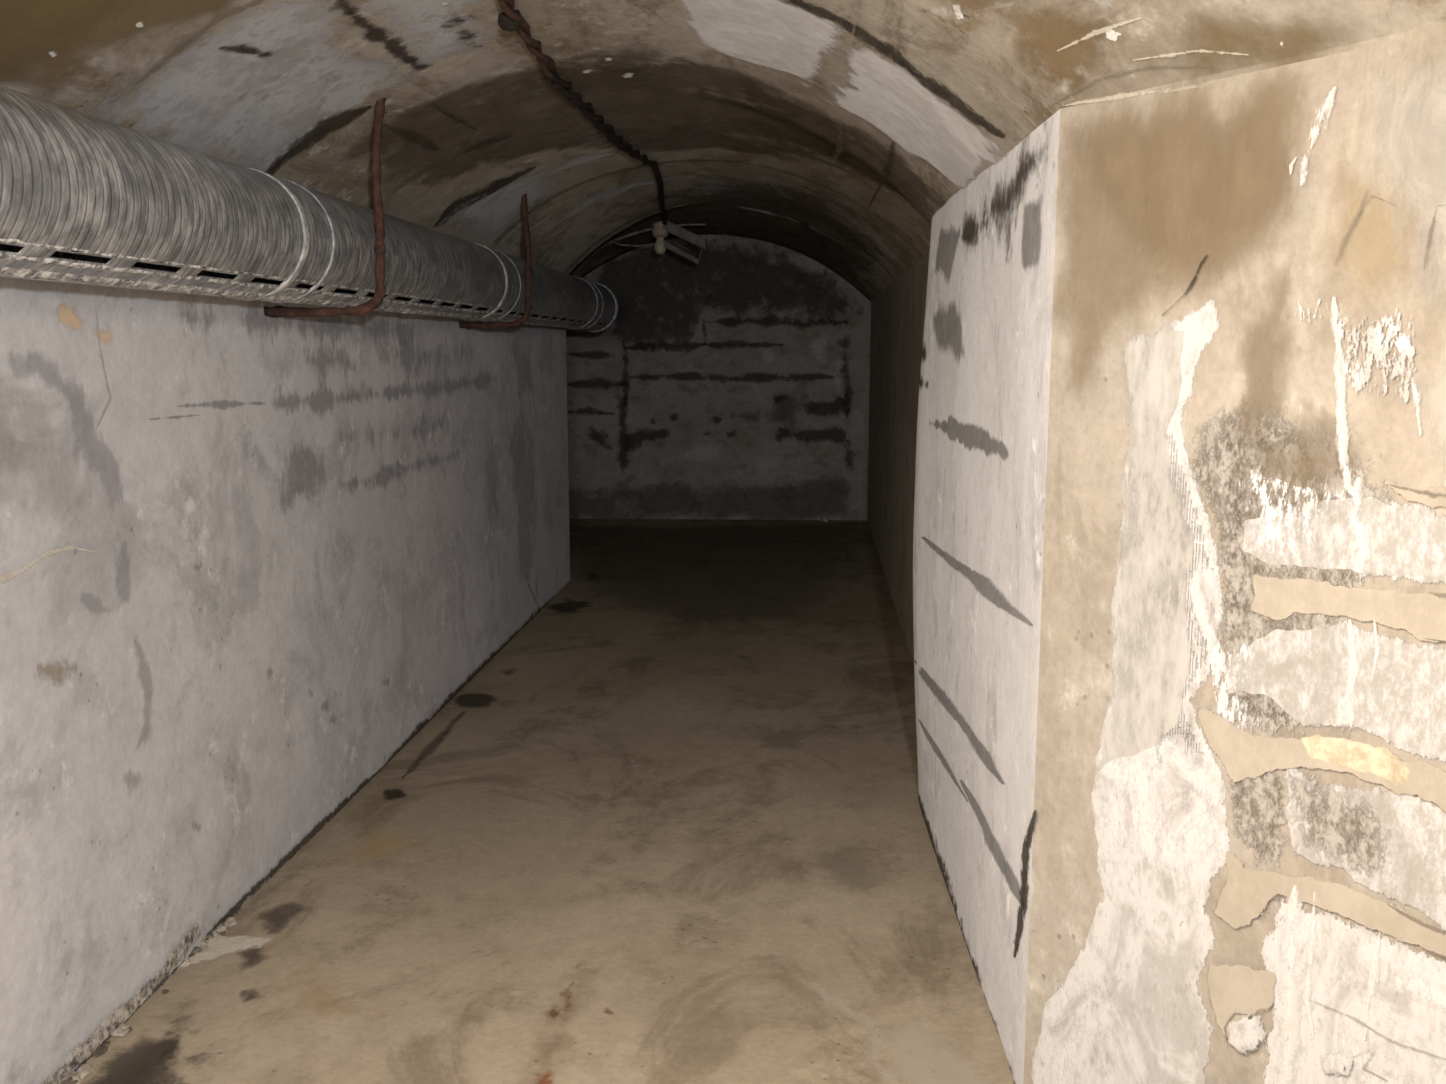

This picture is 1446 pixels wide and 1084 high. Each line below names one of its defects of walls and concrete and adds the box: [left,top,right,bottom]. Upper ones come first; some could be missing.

damp [0,0,228,89]
damp [221,45,270,57]
damp [337,0,429,70]
damp [441,2,475,44]
damp [266,106,371,175]
damp [350,52,1041,278]
damp [1075,86,1337,317]
damp [0,178,882,415]
damp [934,305,963,358]
peeling [1031,297,1446,1084]
spalling [41,912,238,1084]
damp [93,1040,177,1084]